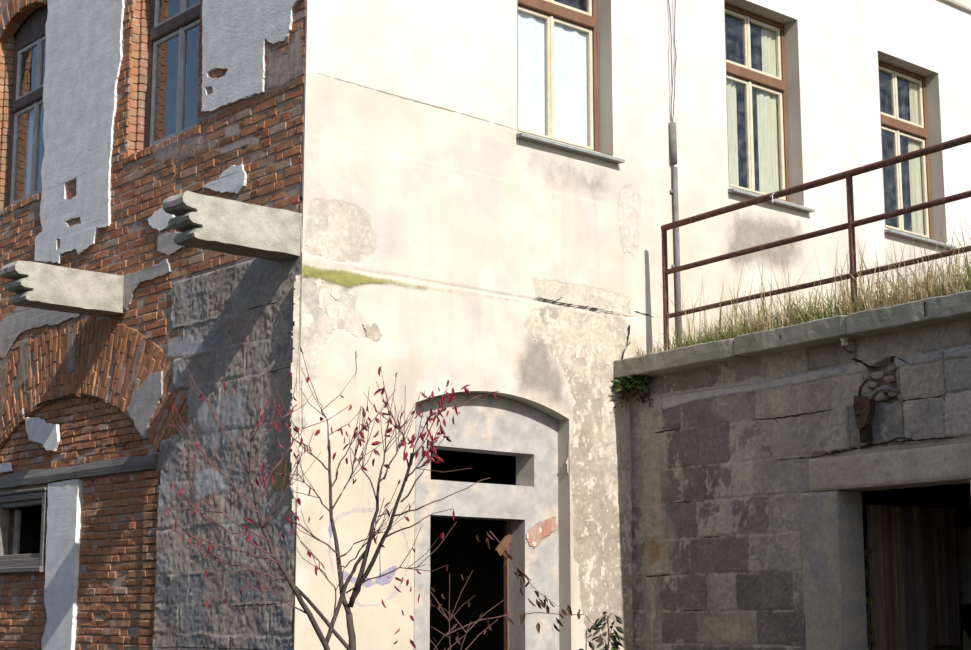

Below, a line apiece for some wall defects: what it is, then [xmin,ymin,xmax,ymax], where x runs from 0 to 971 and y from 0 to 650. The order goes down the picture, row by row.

flaking render [201,0,303,112]
flaking render [34,0,125,264]
flaking render [202,165,247,194]
flaking render [123,207,186,310]
spalling [301,199,377,263]
damp [730,220,795,265]
flaking render [0,307,81,358]
flaking render [25,417,60,451]
flaking render [127,371,164,438]
flaking render [290,275,383,513]
flaking render [524,278,634,650]